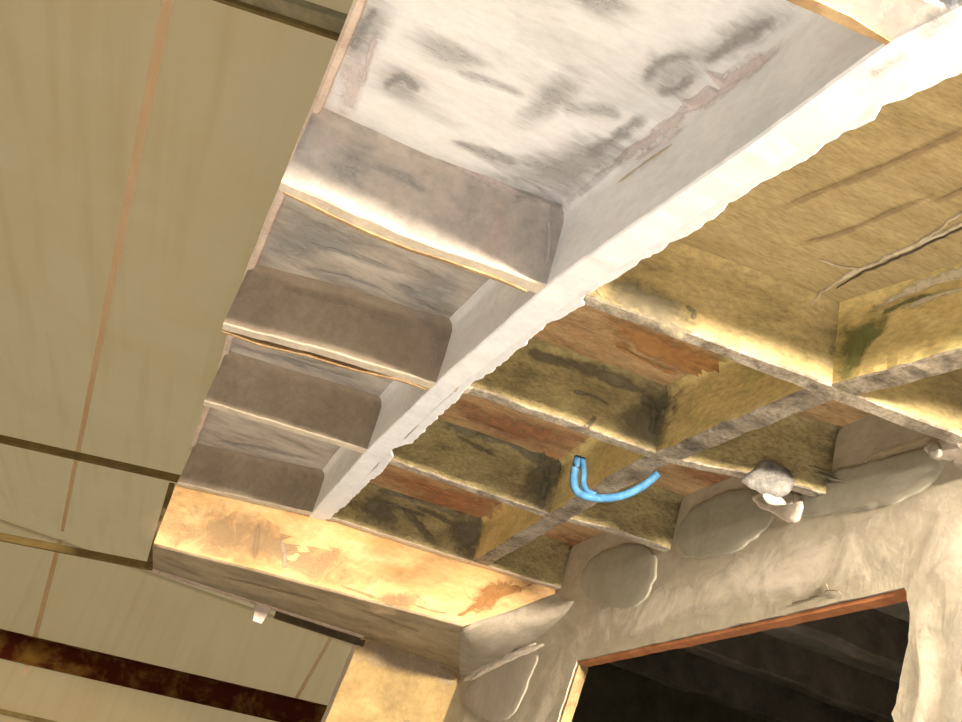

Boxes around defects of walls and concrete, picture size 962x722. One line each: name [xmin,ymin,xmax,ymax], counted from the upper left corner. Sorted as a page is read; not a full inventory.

damp [517,120,640,205]
crack [811,212,962,305]
damp [839,267,962,382]
damp [528,349,676,449]
damp [446,422,561,509]
damp [177,515,339,577]
damp [361,488,480,557]